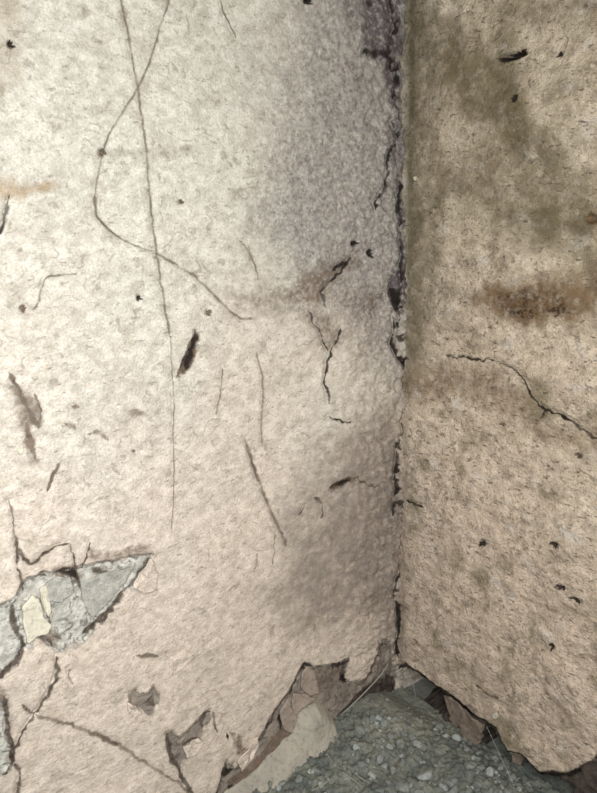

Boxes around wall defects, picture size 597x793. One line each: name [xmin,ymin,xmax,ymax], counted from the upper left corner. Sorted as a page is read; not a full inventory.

water stain [441,25,532,141]
crack [309,257,352,423]
crack [374,121,407,368]
crack [446,354,597,439]
water stain [477,280,597,324]
crack [354,423,423,520]
spalling [0,554,158,679]
crack [393,556,401,658]
crack [9,656,70,793]
spalling [127,686,160,718]
peeling [165,641,501,793]
spalling [508,751,597,793]